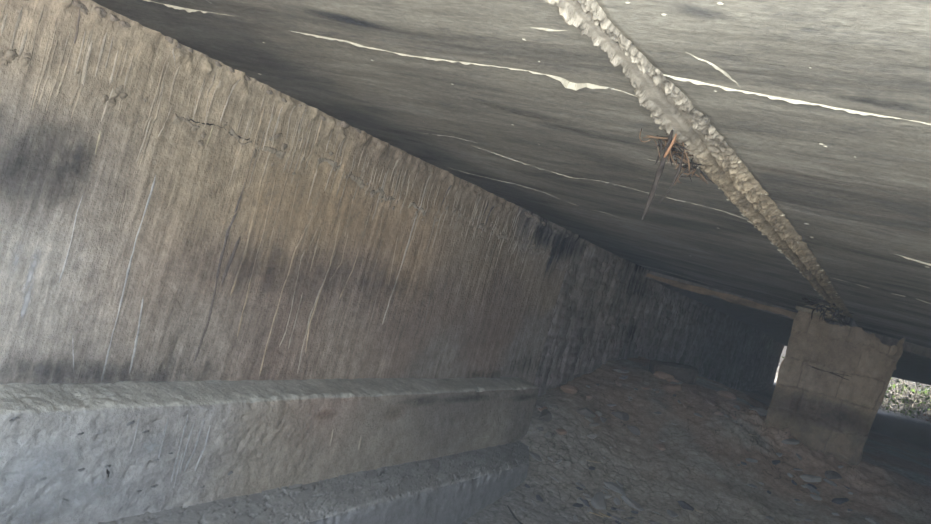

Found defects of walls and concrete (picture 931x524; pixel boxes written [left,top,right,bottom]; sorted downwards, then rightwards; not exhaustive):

damp [0,0,143,154]
crack [187,119,250,140]
damp [332,16,378,28]
damp [95,175,156,382]
damp [194,94,579,376]